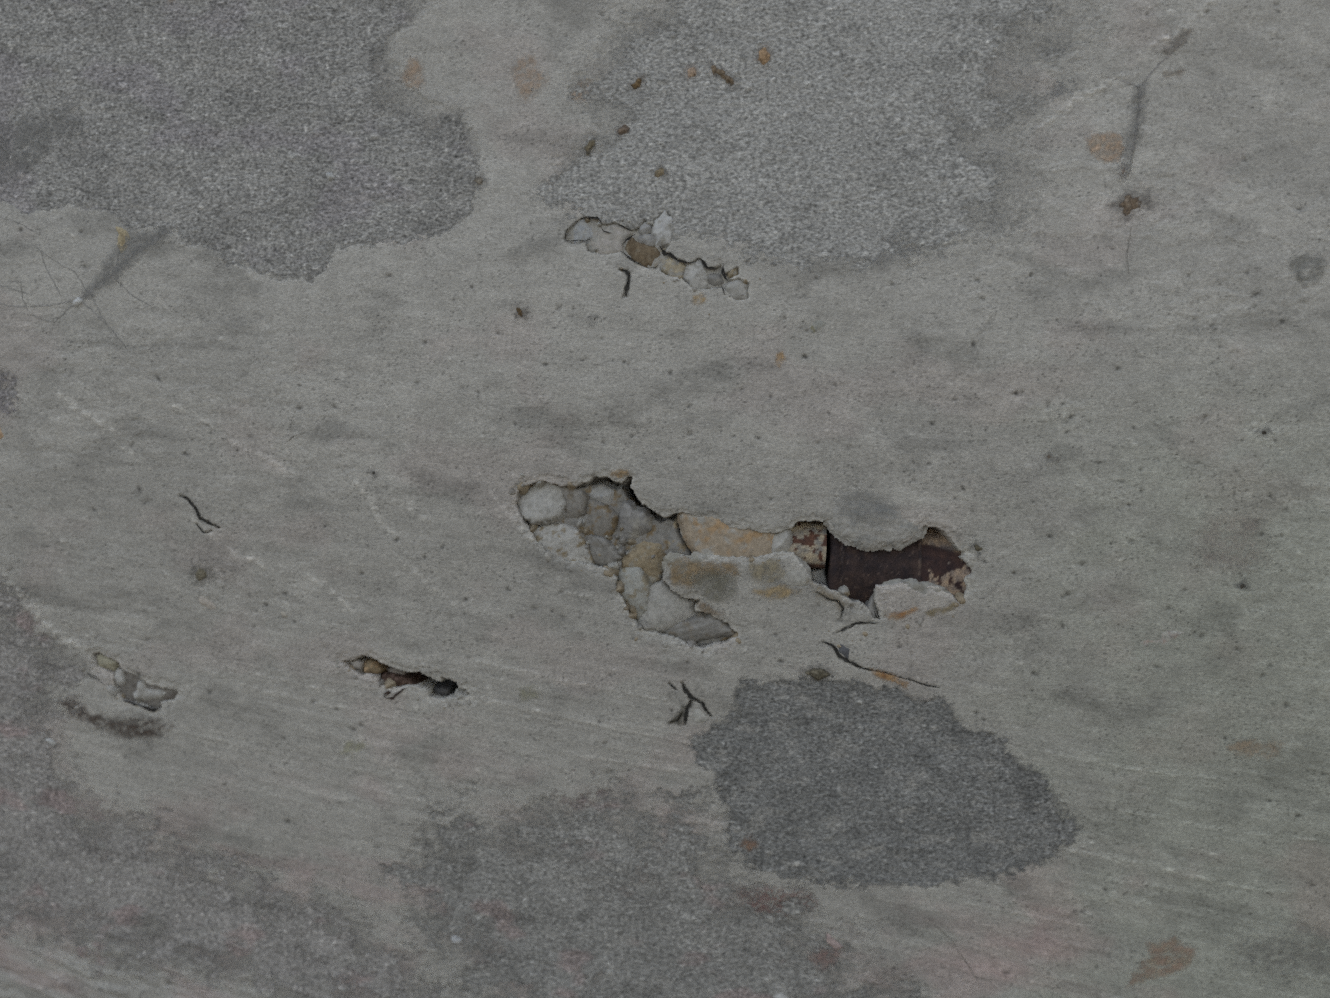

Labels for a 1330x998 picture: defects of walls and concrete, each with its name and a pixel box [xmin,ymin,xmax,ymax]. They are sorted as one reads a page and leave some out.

peeling [539,0,1070,316]
crack [180,496,220,533]
peeling [0,570,1080,998]
spalling [509,473,850,653]
crack [668,683,712,724]
crack [817,592,940,688]